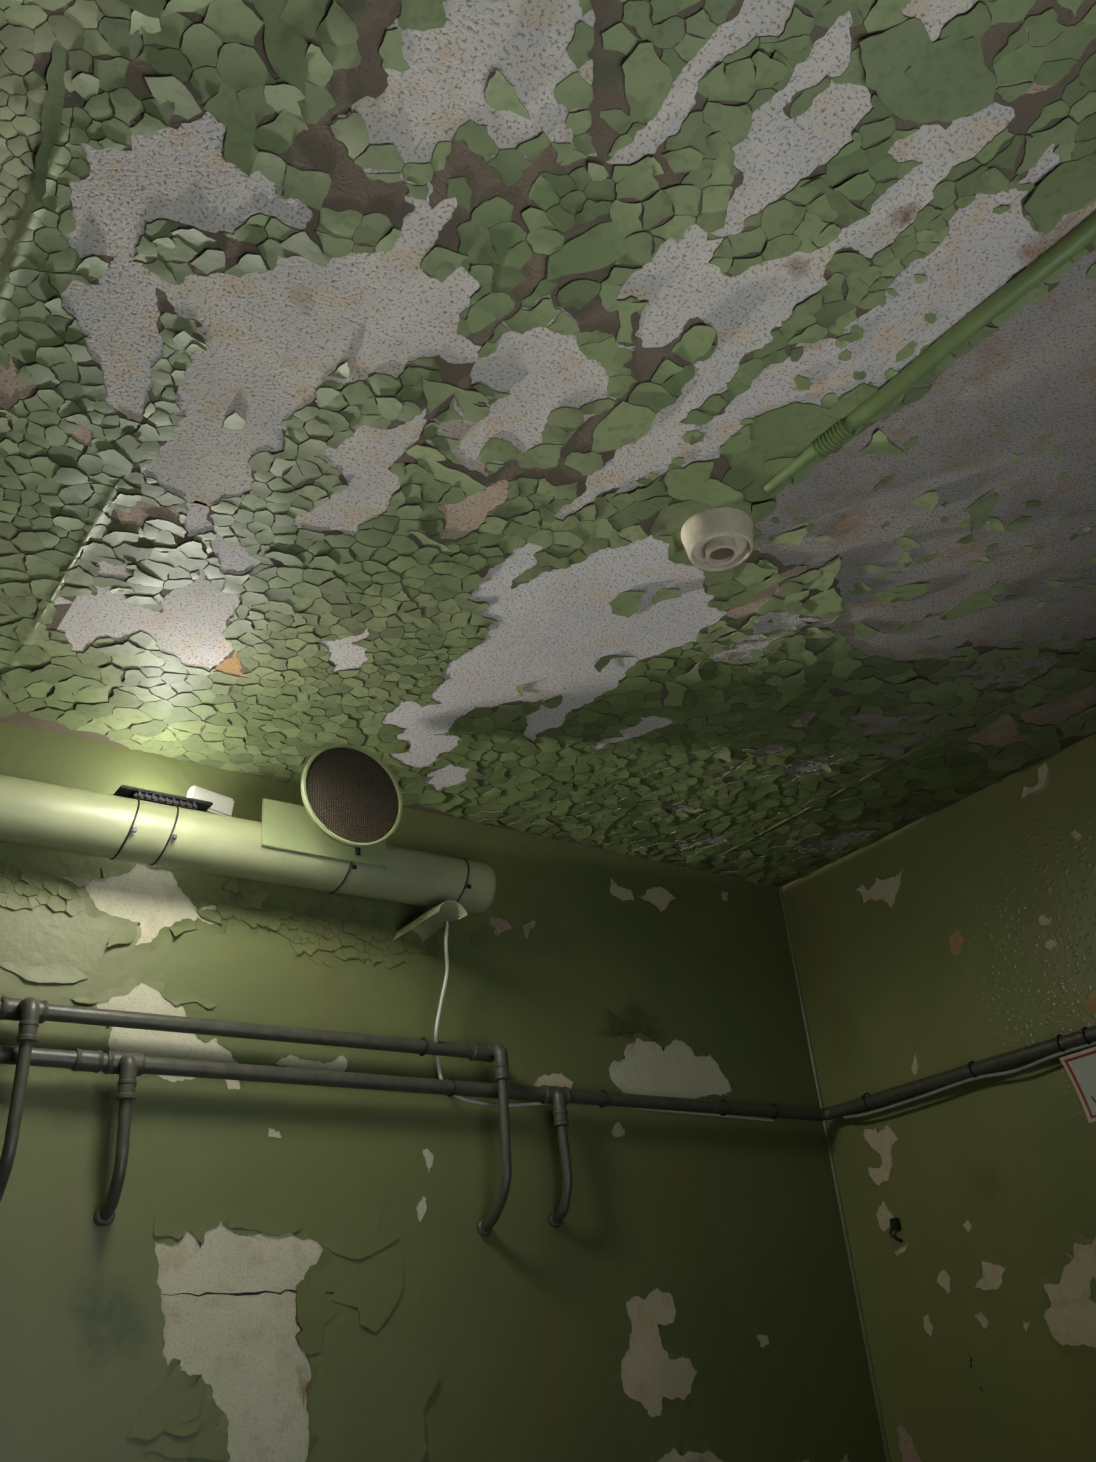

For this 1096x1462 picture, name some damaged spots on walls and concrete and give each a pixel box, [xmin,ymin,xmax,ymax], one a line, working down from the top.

peeling [0,0,1096,805]
peeling [653,798,743,858]
peeling [58,861,229,951]
peeling [0,962,250,1099]
peeling [271,1051,351,1072]
peeling [602,1030,737,1113]
peeling [126,1209,338,1462]
peeling [613,1279,730,1462]
peeling [1022,1225,1096,1357]